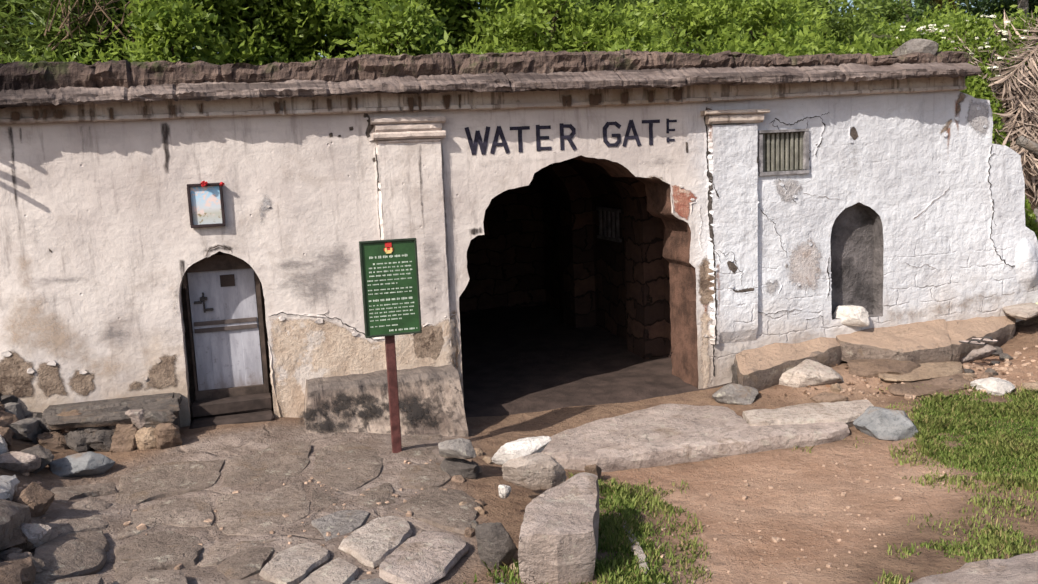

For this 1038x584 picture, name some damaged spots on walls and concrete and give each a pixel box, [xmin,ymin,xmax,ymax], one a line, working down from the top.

damp [161,105,176,171]
flaking render [941,93,989,137]
spalling [649,176,697,221]
crack [758,111,839,258]
crack [985,144,1015,271]
crack [698,107,722,377]
flaking render [698,239,821,389]
flaking render [0,350,95,398]
flaking render [129,355,177,390]
flaking render [268,313,462,418]
mould [300,393,442,432]